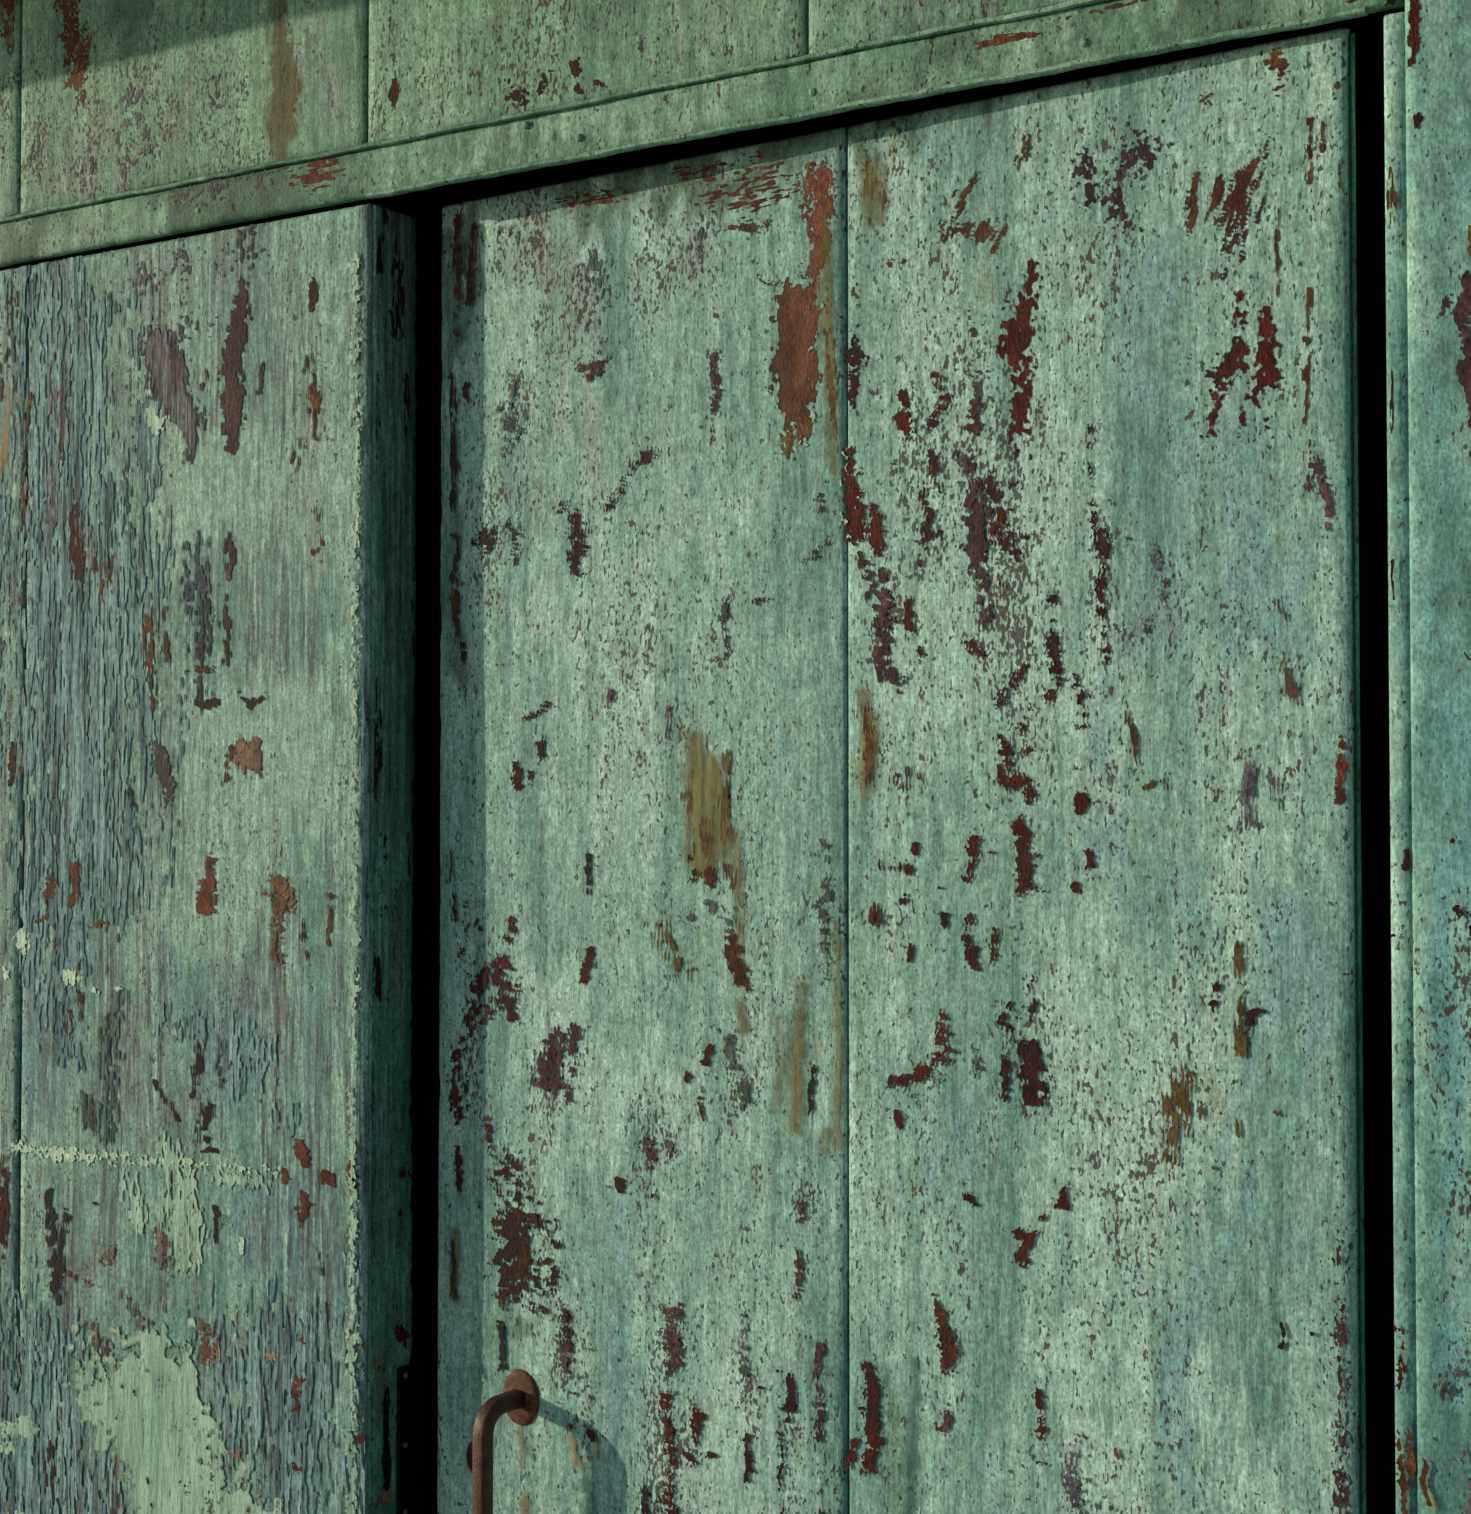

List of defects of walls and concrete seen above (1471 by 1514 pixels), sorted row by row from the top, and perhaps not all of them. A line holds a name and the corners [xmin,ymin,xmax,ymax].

peeling [24,105,59,185]
peeling [69,156,97,197]
peeling [107,47,172,192]
peeling [196,74,228,122]
corrosion [794,159,838,282]
peeling [1194,289,1285,439]
peeling [1436,270,1471,457]
peeling [801,446,924,694]
peeling [0,169,387,1514]
corrosion [683,855,717,888]
peeling [446,901,594,1404]